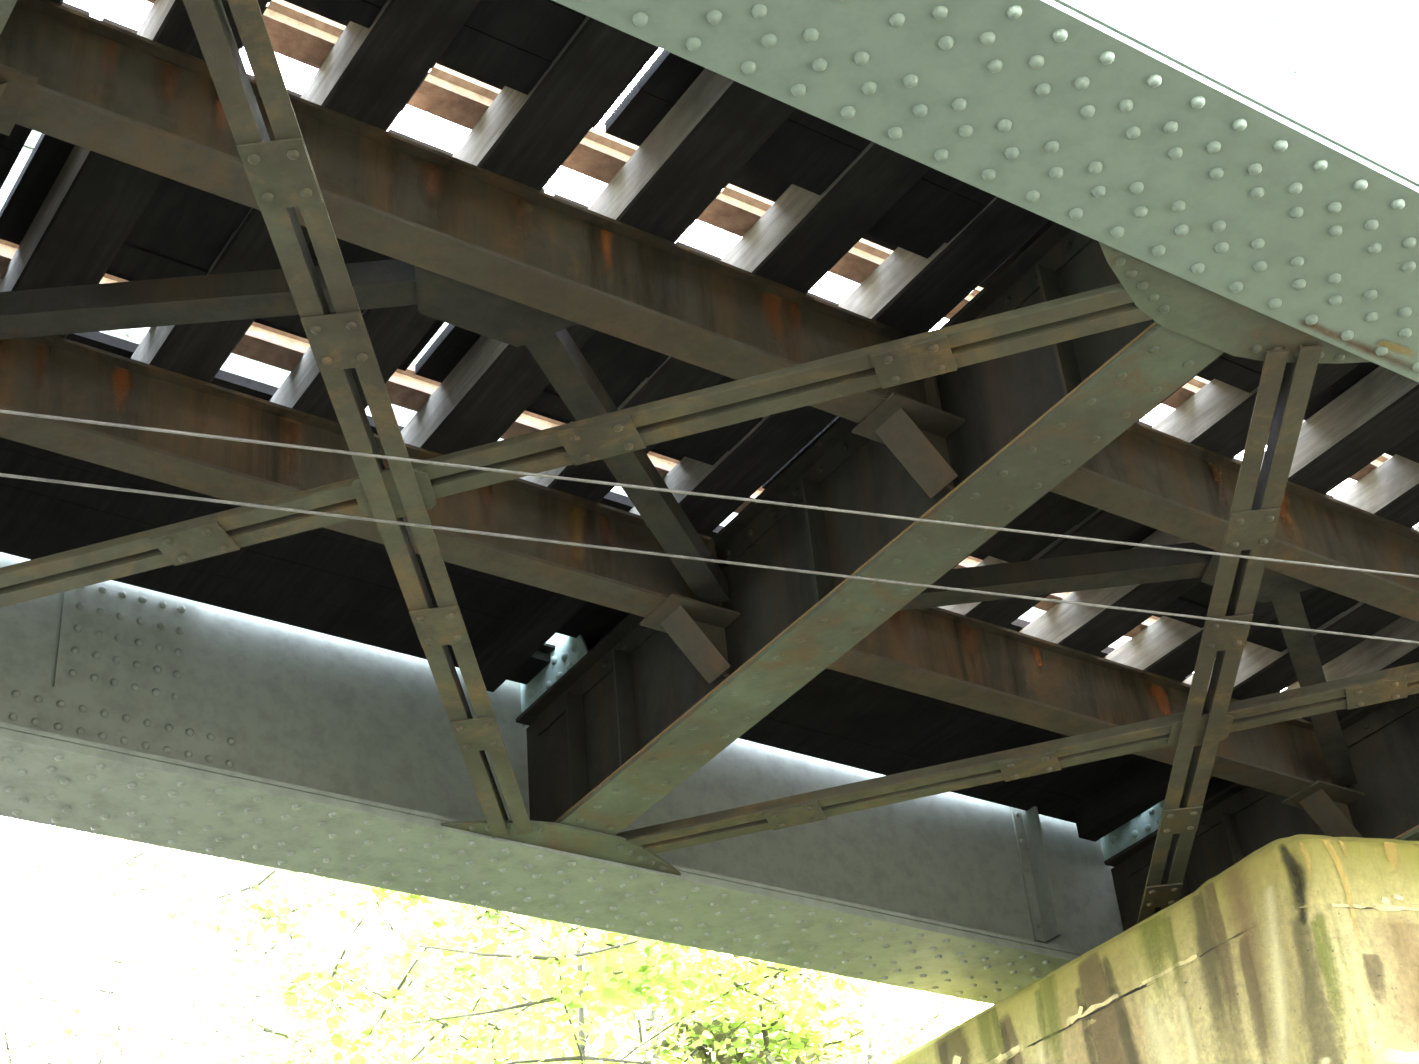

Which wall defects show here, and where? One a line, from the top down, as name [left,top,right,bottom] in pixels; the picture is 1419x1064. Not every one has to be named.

leakage [992,1007,1022,1064]
leakage [1079,955,1139,1064]
leakage [1204,884,1265,1050]
leakage [1386,1049,1419,1064]